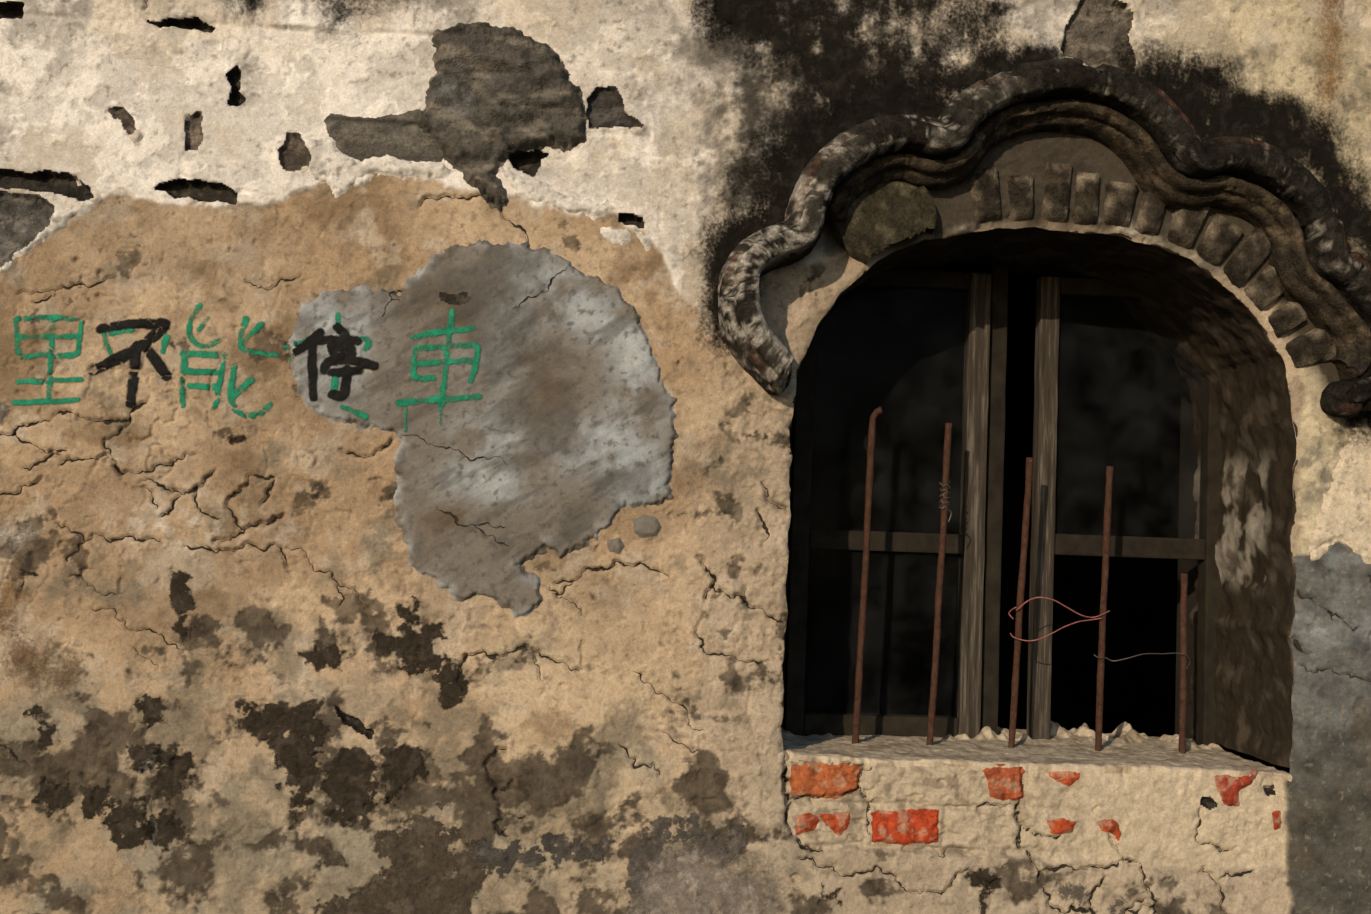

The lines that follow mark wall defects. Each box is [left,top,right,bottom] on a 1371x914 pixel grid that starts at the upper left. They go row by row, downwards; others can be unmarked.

spalling [1058,0,1136,72]
spalling [0,168,103,272]
spalling [277,109,456,198]
leakage [693,0,1067,349]
leakage [1114,46,1371,264]
crack [0,400,368,668]
leakage [372,595,469,709]
crack [547,561,668,618]
crack [696,557,783,665]
leakage [235,698,786,914]
spalling [781,757,1294,871]
crack [978,767,1160,914]